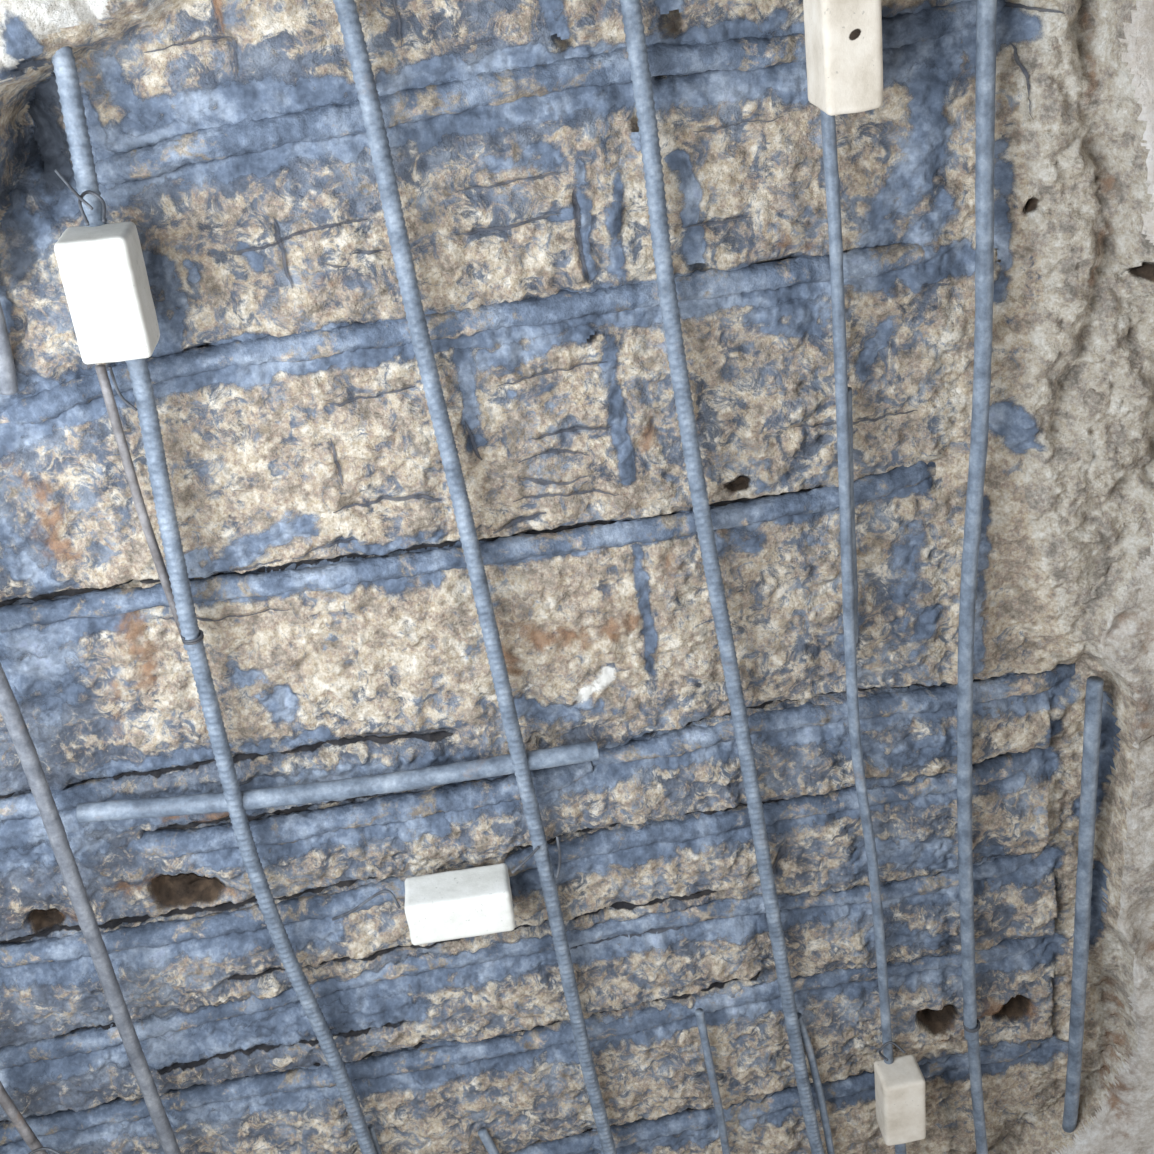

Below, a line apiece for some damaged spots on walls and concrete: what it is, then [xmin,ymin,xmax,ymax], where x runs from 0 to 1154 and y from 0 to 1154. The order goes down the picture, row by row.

spalling [0,0,878,1154]
spalling [797,0,1154,1154]